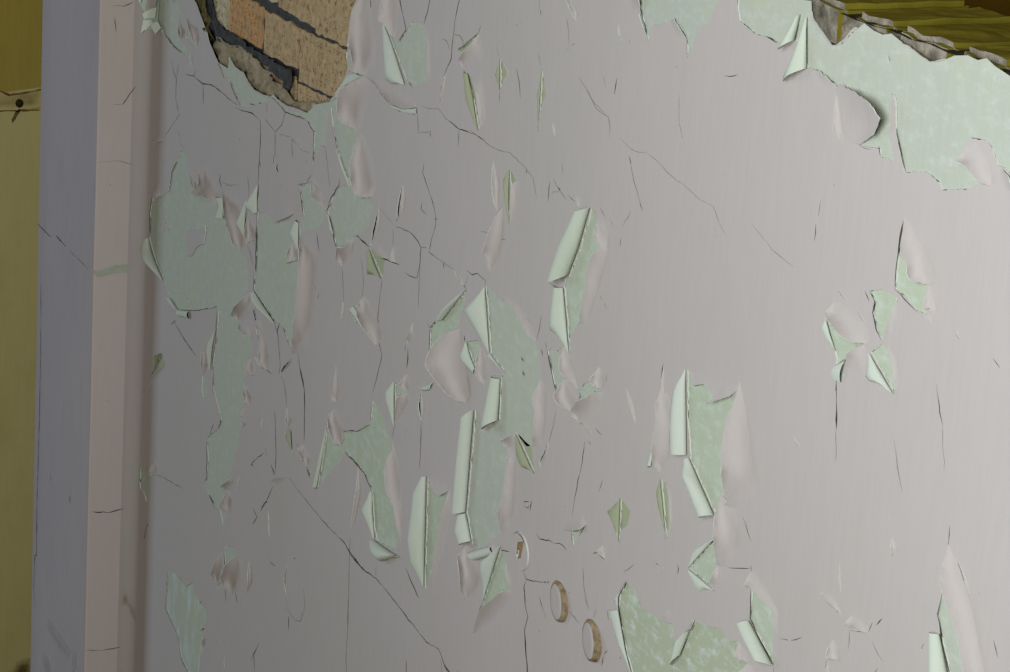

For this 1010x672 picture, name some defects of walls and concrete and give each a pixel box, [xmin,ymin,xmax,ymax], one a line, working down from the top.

flaking render [138,0,431,198]
crack [384,166,485,306]
crack [417,2,563,197]
crack [579,77,724,243]
peeling [737,0,1010,192]
peeling [140,151,318,523]
crack [276,325,305,422]
peeling [312,193,608,634]
crack [251,433,449,672]
crack [523,572,549,672]
peeling [607,365,778,672]
peeling [928,526,984,672]